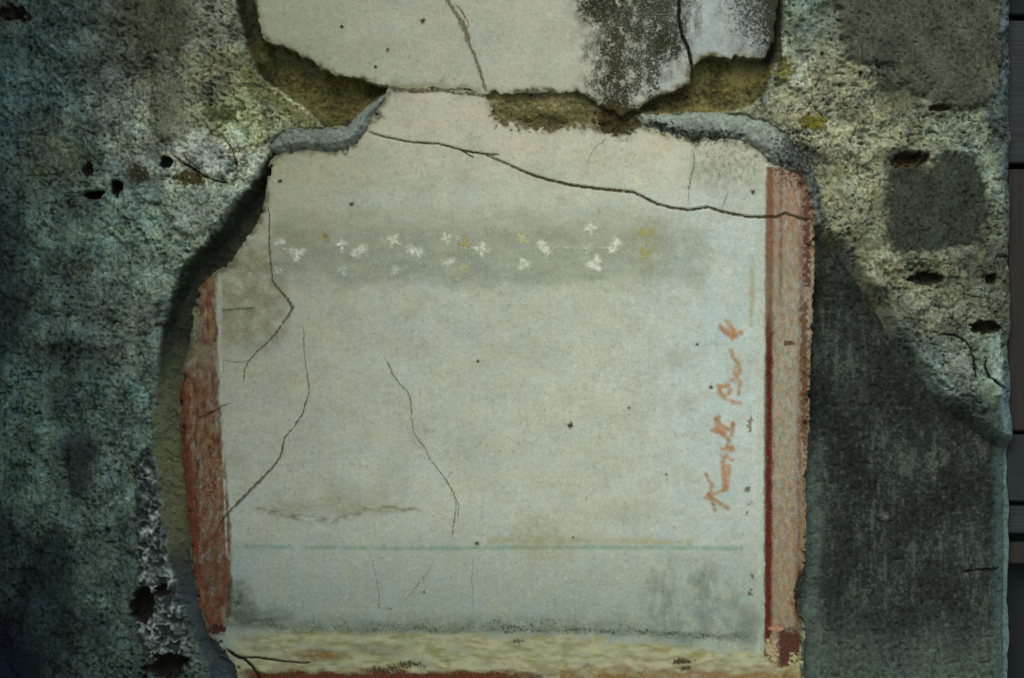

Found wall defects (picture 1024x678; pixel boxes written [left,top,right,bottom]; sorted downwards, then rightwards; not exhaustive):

spalling [237,0,388,129]
crack [390,0,487,97]
spalling [487,0,786,134]
damp [577,0,756,180]
crack [677,0,693,65]
crack [371,132,806,220]
damp [768,128,820,186]
spalling [151,150,281,678]
crack [218,208,310,527]
peeling [784,302,809,452]
crack [228,650,309,678]
peeling [765,625,804,667]